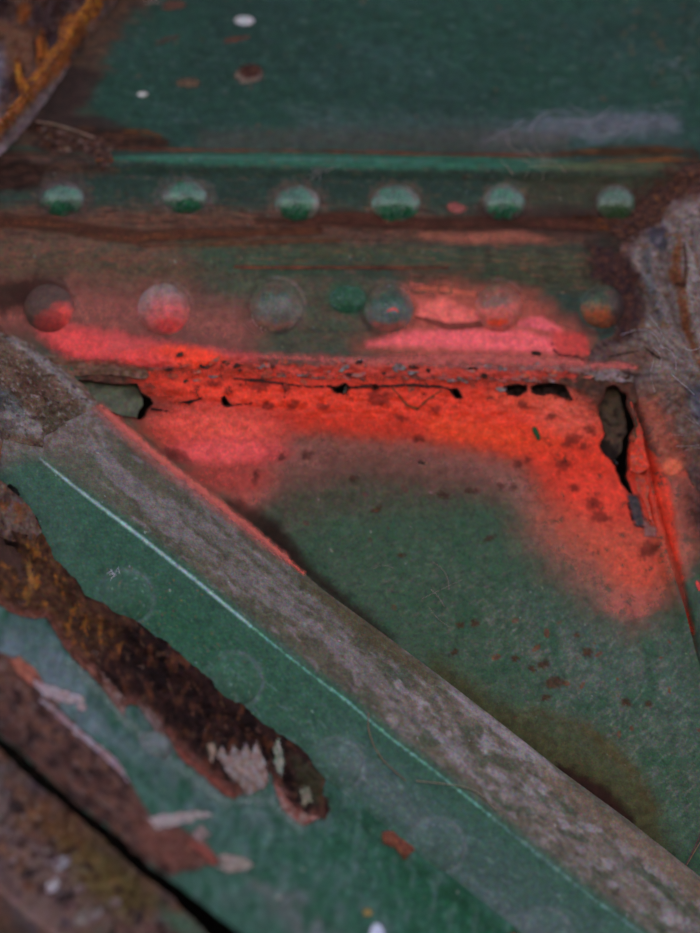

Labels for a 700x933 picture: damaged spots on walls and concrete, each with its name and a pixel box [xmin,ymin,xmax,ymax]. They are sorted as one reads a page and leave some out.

corrosion [6,0,105,110]
corrosion [163,352,242,385]
corrosion [297,357,367,386]
corrosion [381,364,431,375]
corrosion [447,362,508,392]
crack [151,397,202,411]
crack [232,378,450,410]
corrosion [233,505,345,603]